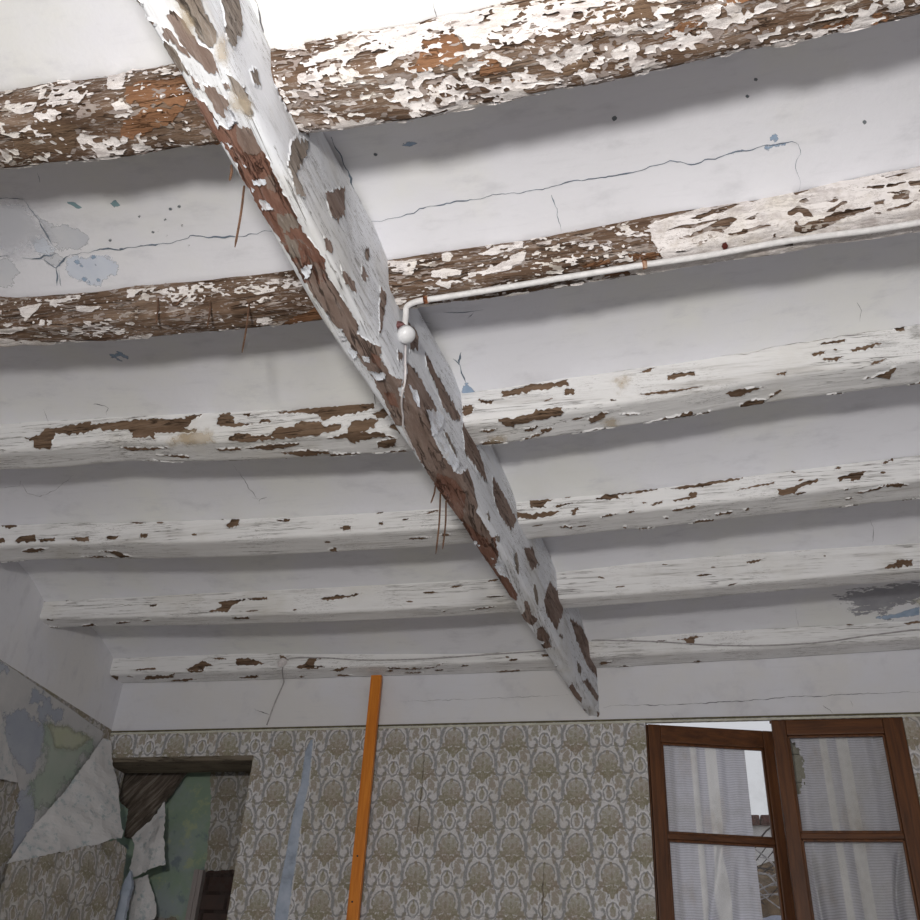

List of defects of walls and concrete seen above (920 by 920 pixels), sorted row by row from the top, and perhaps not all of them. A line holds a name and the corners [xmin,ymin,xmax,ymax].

crack [383,141,801,227]
crack [0,198,266,285]
peeling [0,0,920,717]